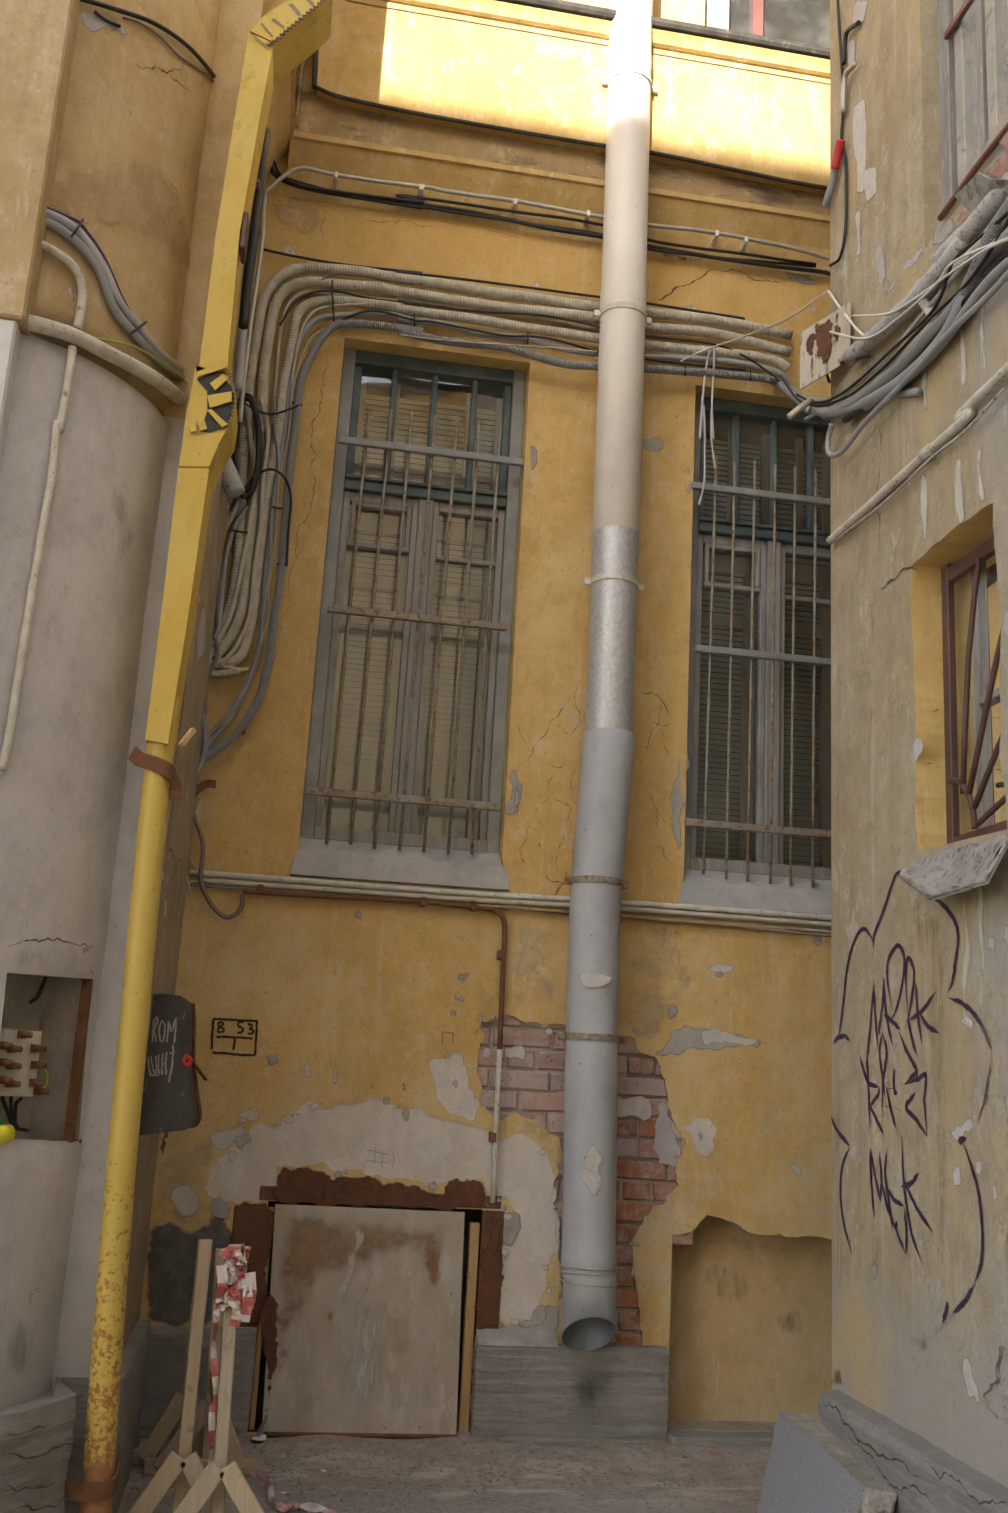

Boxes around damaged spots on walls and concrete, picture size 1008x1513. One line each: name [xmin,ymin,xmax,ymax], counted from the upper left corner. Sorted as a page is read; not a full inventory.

crack [137,65,190,91]
crack [659,269,781,300]
crack [517,689,580,909]
peeling [580,961,612,988]
peeling [171,1015,566,1330]
spalling [581,1005,761,1345]
peeling [953,1161,982,1185]
crack [4,1425,75,1513]
crack [825,1402,1007,1507]